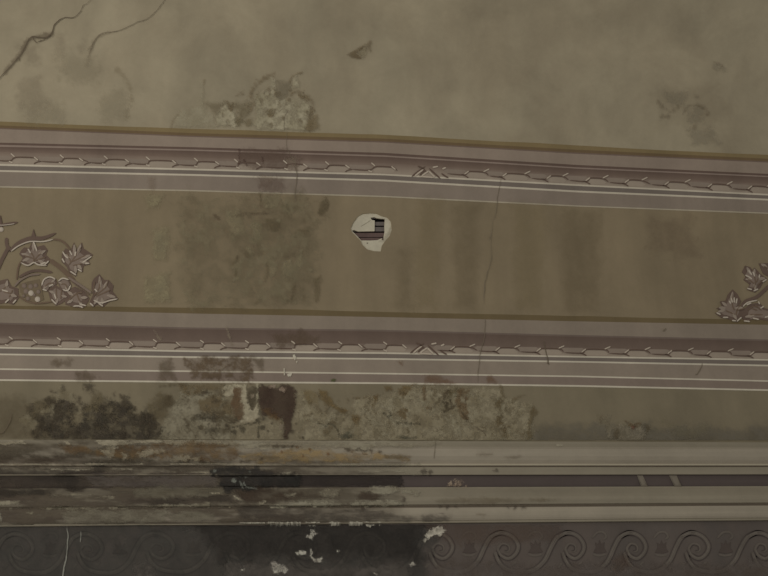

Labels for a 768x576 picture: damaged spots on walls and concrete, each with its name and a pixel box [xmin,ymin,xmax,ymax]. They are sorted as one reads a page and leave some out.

crack [0,3,87,77]
flaking render [351,213,392,251]
damp [0,356,402,501]
peeling [216,383,424,450]
peeling [71,440,206,471]
peeling [259,489,339,508]
peeling [351,485,420,510]